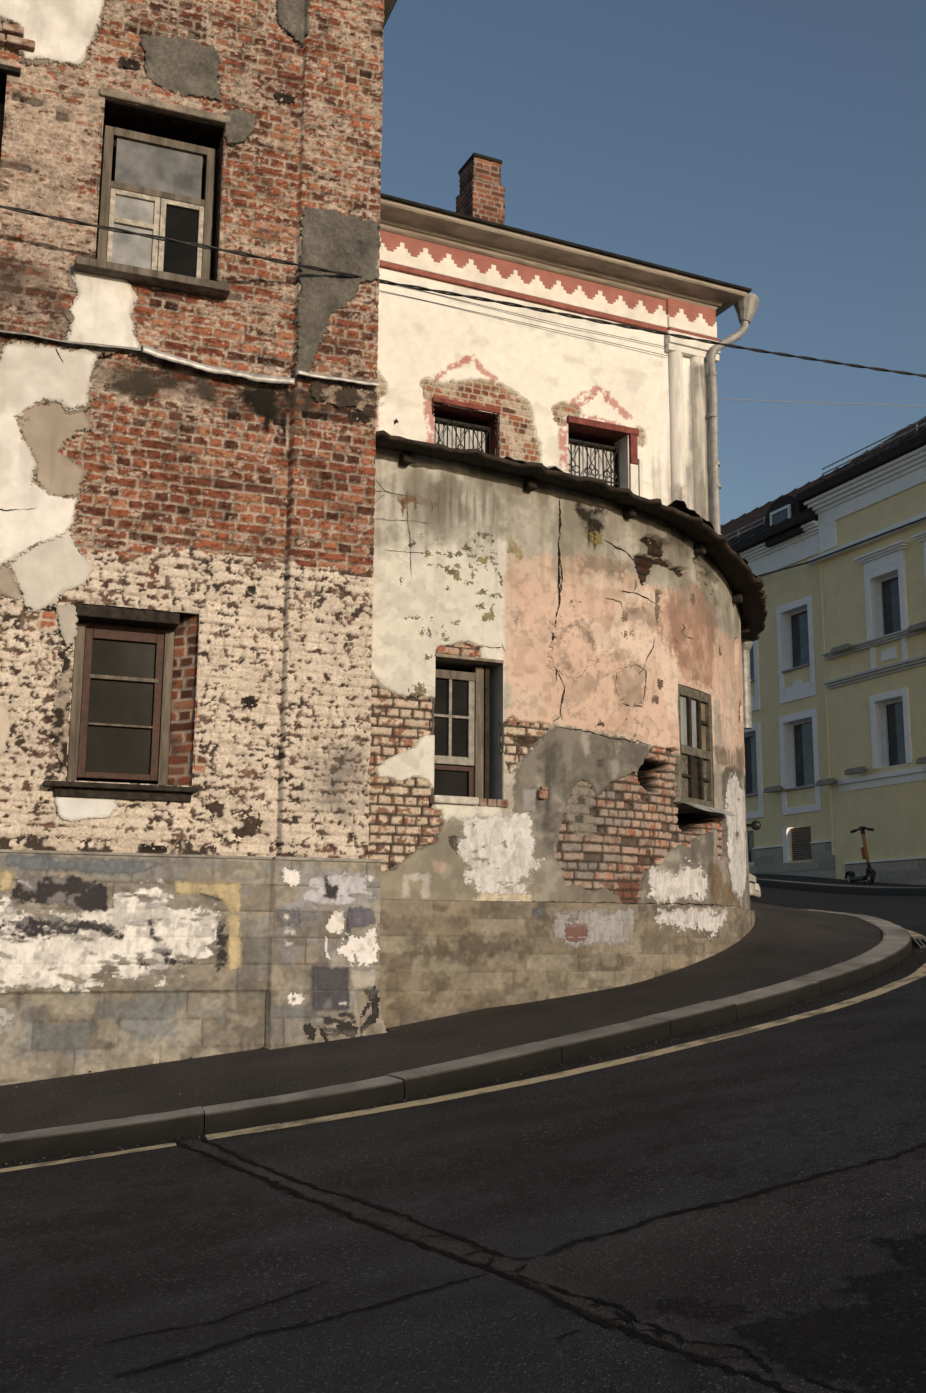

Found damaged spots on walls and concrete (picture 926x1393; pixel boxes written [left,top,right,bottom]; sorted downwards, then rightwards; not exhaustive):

peeling [0,0,109,69]
spalling [118,56,141,70]
spalling [274,90,296,104]
peeling [419,379,541,463]
peeling [551,402,581,427]
peeling [0,262,263,1027]
spalling [404,615,483,662]
crack [552,500,693,745]
spalling [634,536,717,624]
spalling [276,676,747,1036]
crack [421,1234,854,1393]
leakage [657,1234,926,1393]